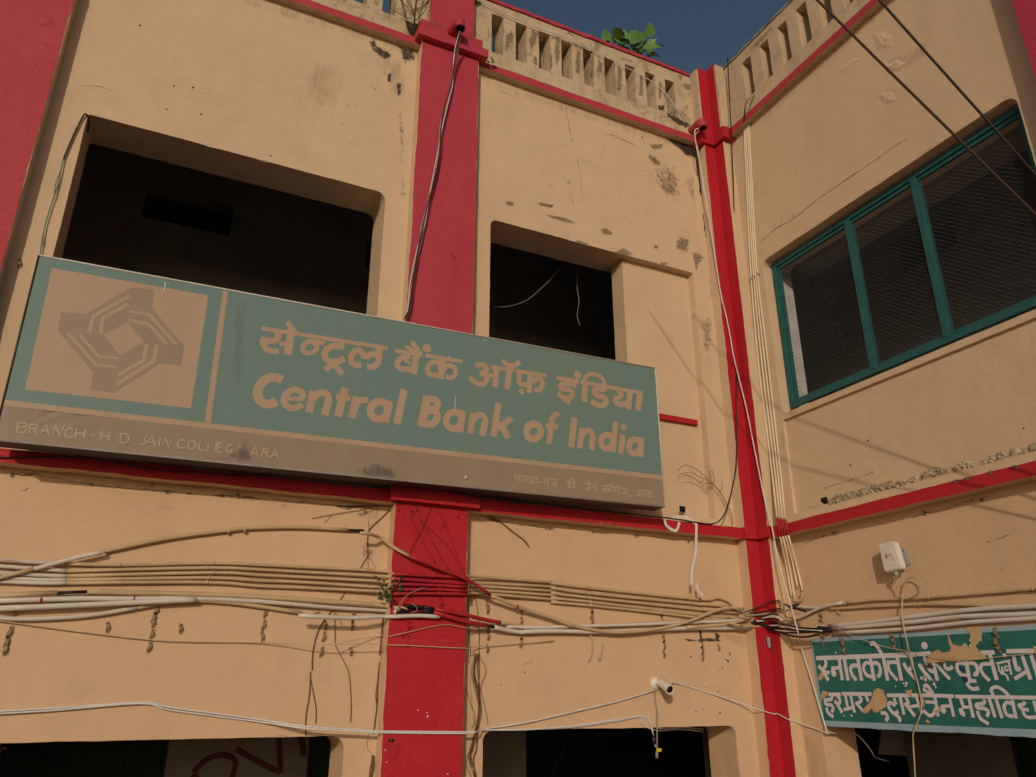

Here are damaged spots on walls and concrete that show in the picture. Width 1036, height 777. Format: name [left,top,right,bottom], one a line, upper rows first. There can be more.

crack [758,142,900,243]
spalling [675,235,704,269]
spalling [821,443,1036,505]